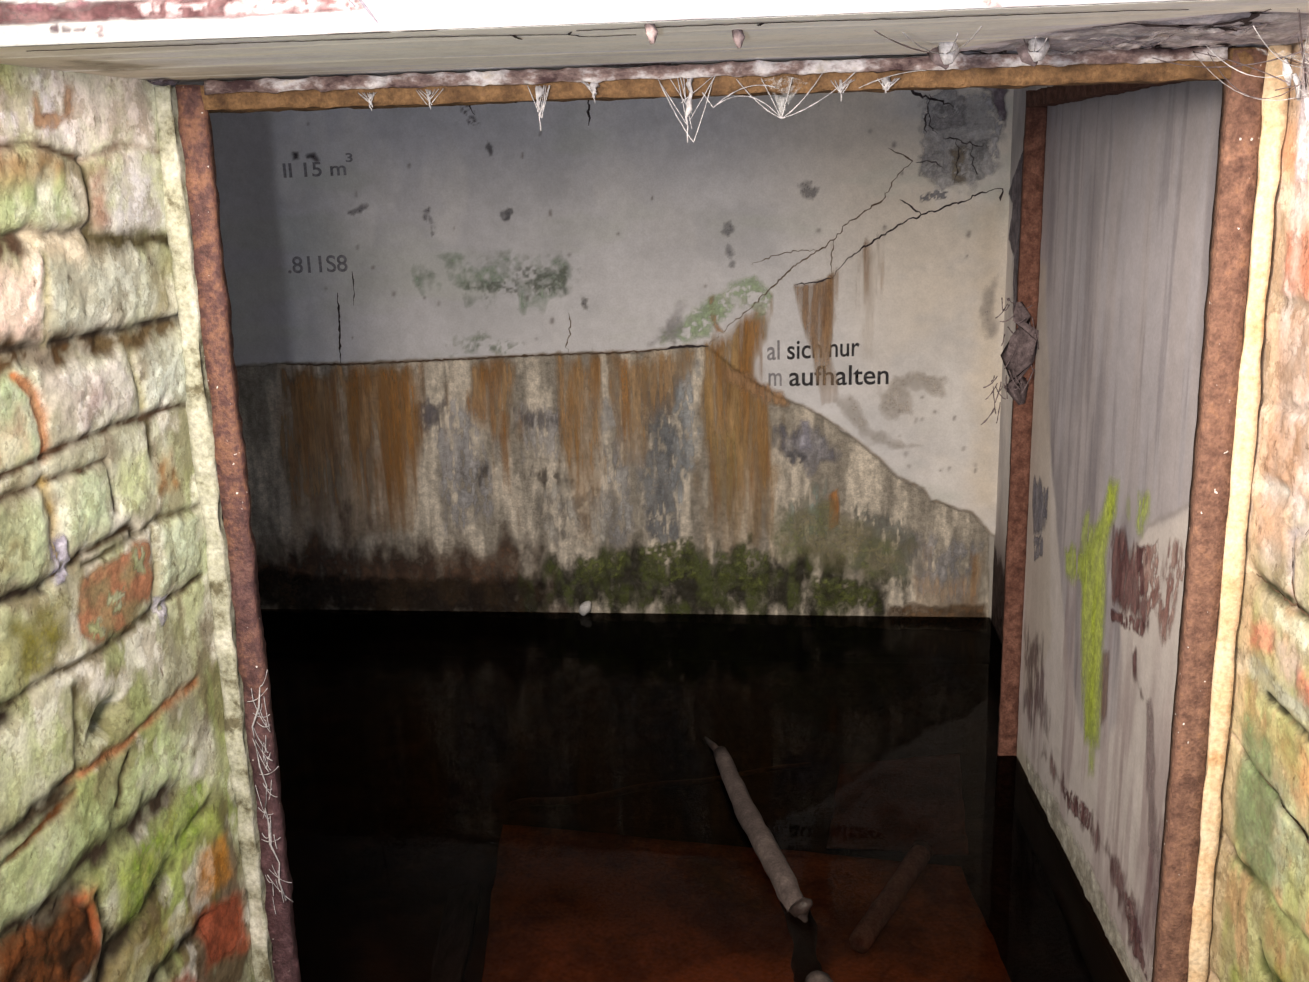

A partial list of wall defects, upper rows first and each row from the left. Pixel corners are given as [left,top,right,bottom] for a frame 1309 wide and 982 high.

crack [27,0,1272,52]
leakage [204,46,1228,95]
crack [861,52,928,60]
crack [960,48,1007,56]
spalling [1045,12,1309,55]
spalling [916,88,1008,201]
crack [286,90,1004,366]
peeling [1009,152,1023,314]
spalling [236,347,989,617]
leakage [257,509,567,612]
leakage [888,549,1004,640]
leakage [1026,761,1141,982]